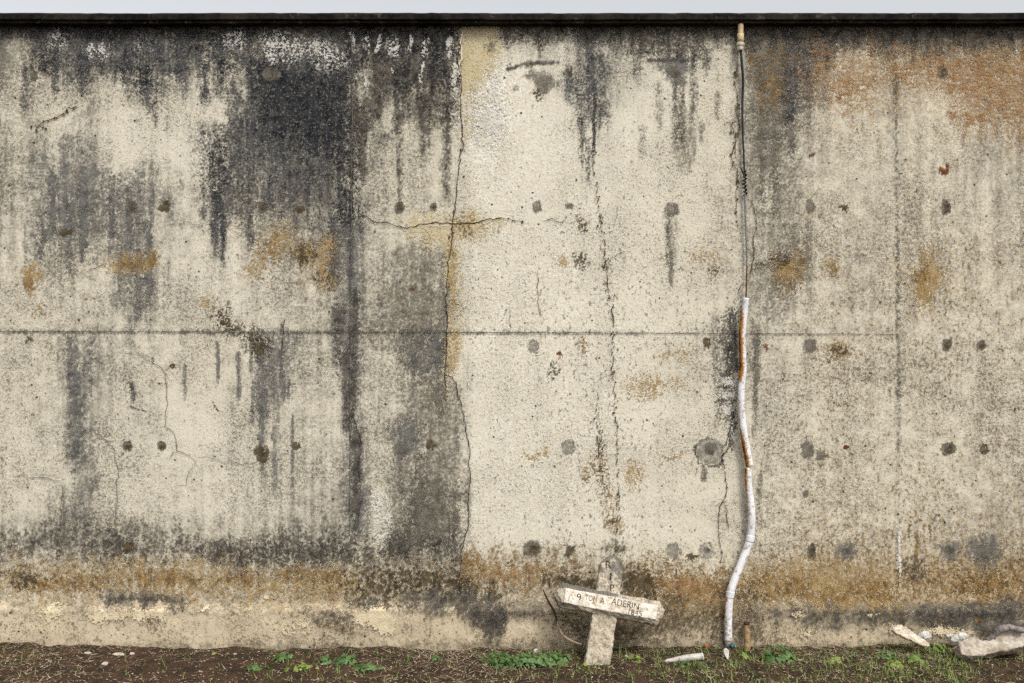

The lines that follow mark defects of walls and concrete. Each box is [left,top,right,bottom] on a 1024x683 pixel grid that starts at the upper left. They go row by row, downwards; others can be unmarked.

corrosion [810,46,1024,141]
water stain [0,26,742,627]
crack [359,29,567,590]
crack [590,95,636,551]
crack [718,422,733,564]
water stain [400,584,545,648]
water stain [552,609,590,647]
water stain [614,594,1024,648]